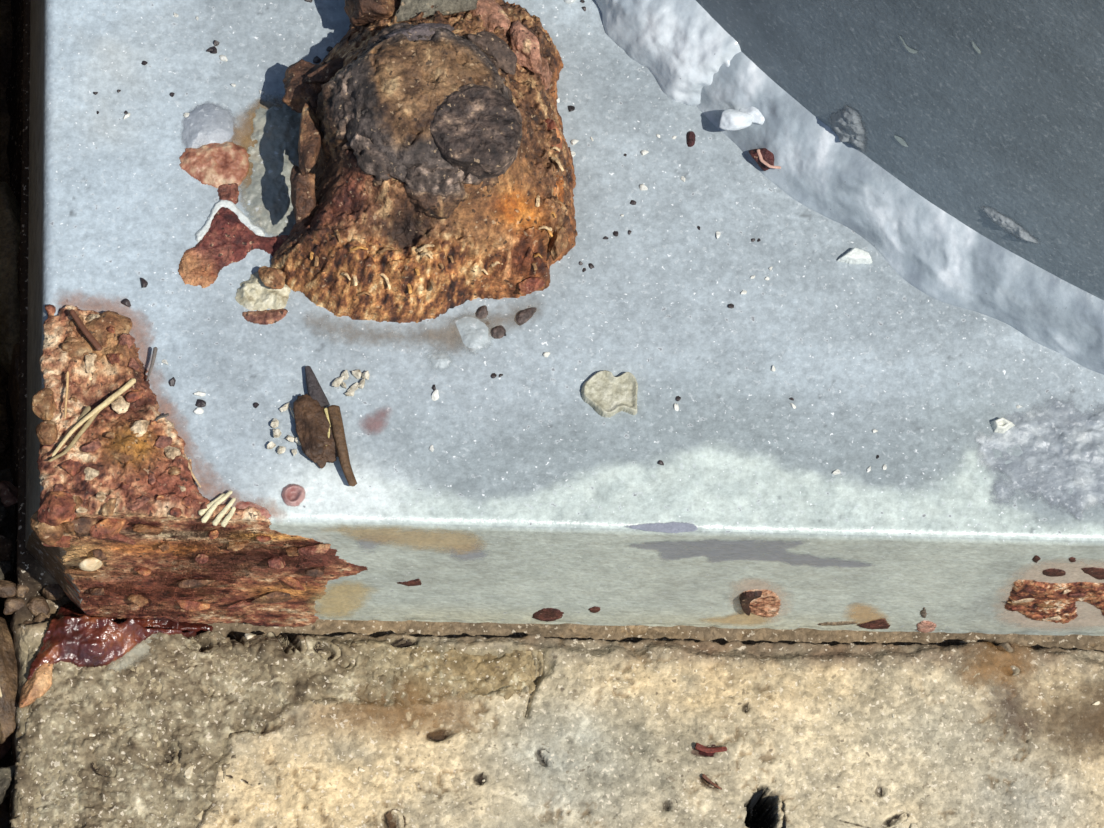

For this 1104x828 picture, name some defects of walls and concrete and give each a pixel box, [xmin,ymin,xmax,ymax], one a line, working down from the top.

corrosion [344,0,552,90]
corrosion [234,113,258,176]
corrosion [282,58,344,224]
corrosion [178,183,288,289]
corrosion [407,268,437,294]
corrosion [518,118,568,295]
peeling [837,248,872,264]
corrosion [423,326,461,347]
corrosion [475,305,537,339]
corrosion [18,299,368,708]
corrosion [741,580,776,594]
corrosion [1005,555,1104,627]